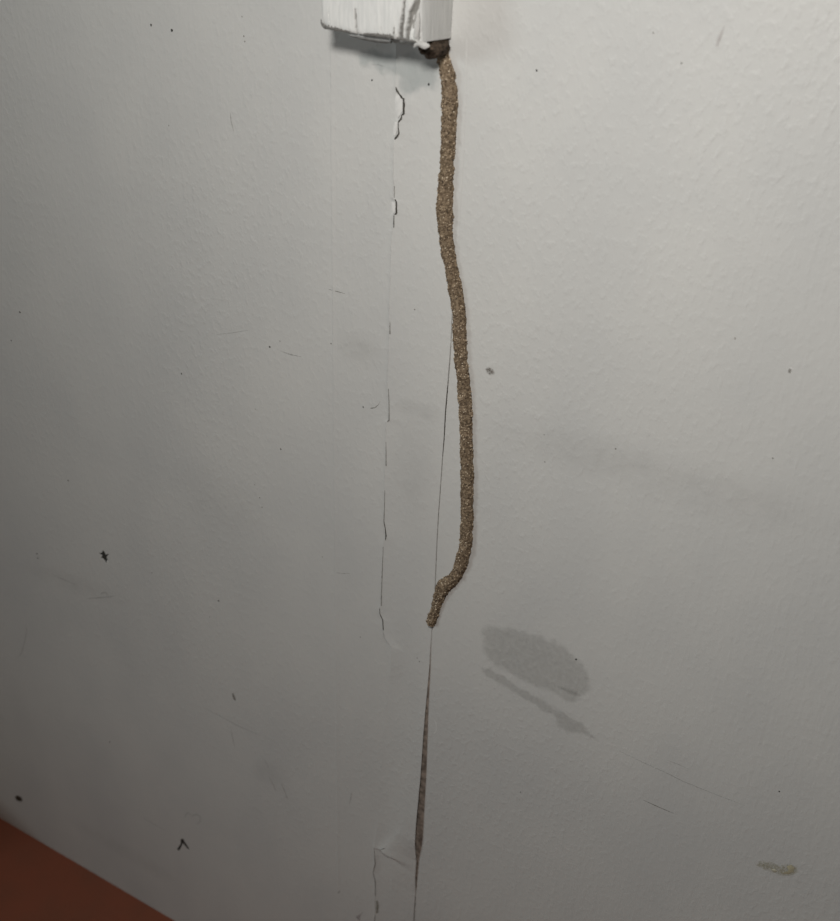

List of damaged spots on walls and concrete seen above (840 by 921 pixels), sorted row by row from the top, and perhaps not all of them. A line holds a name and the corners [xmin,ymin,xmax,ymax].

crack [453,38,468,252]
crack [435,327,452,585]